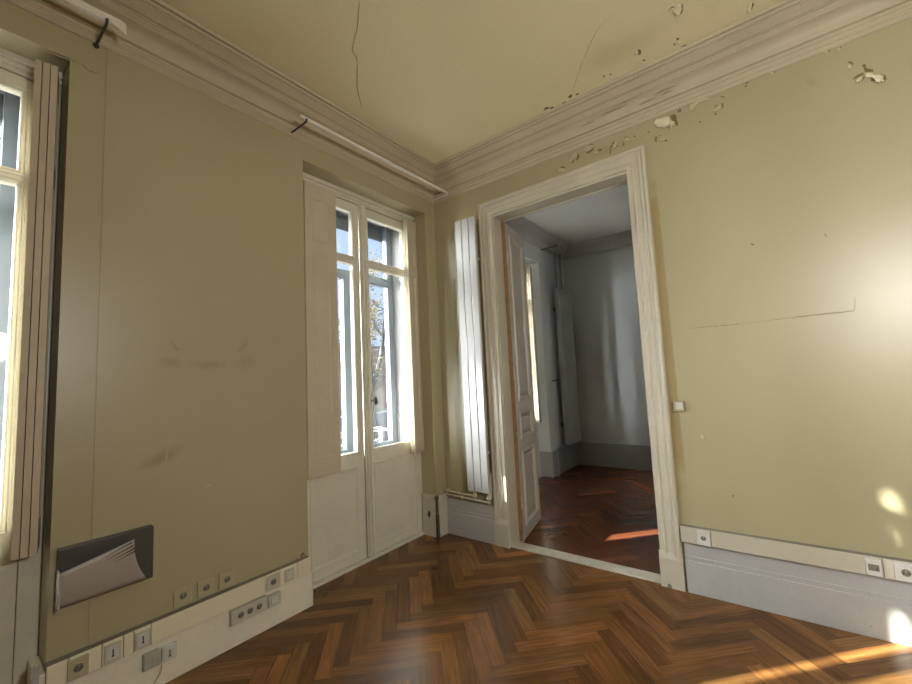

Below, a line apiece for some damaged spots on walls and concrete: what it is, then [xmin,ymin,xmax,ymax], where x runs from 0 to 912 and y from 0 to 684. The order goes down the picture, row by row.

crack [351,0,362,107]
peeling [847,61,886,83]